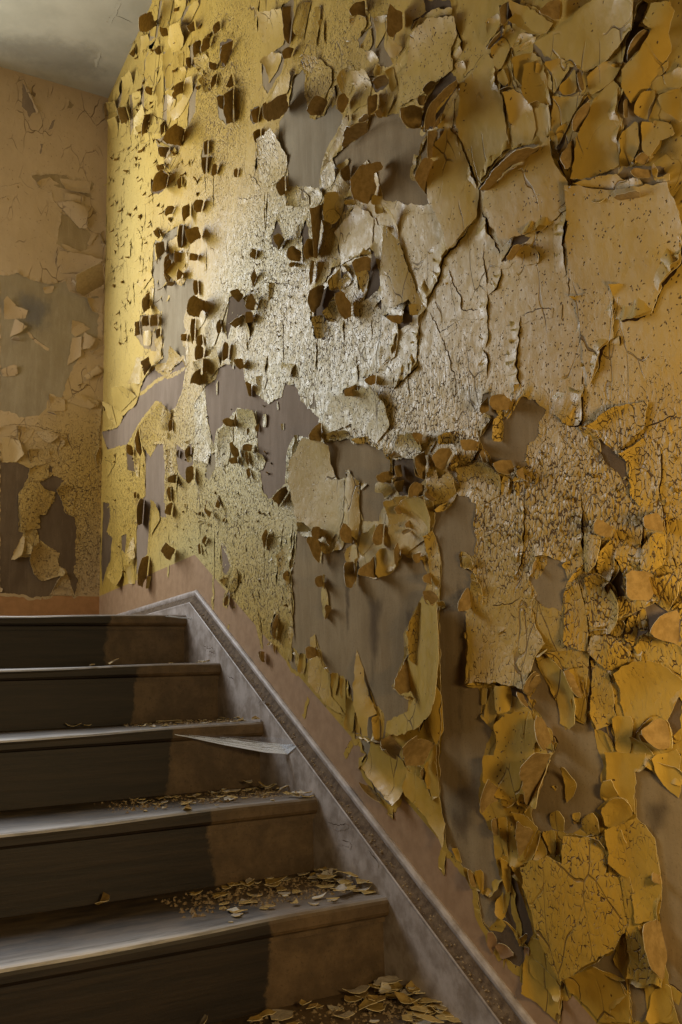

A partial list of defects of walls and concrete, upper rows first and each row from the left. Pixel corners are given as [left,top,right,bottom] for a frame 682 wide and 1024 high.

peeling [103,0,236,209]
crack [453,54,511,187]
peeling [156,204,175,224]
peeling [193,192,204,213]
peeling [270,213,287,254]
peeling [248,269,298,314]
crack [388,182,682,400]
peeling [0,171,133,601]
peeling [190,492,220,554]
peeling [161,536,176,578]
peeling [212,867,376,922]
peeling [247,975,461,1024]